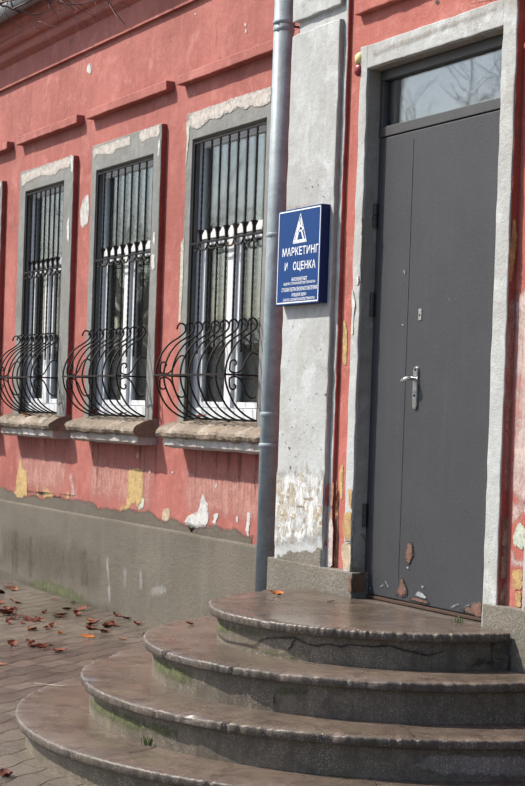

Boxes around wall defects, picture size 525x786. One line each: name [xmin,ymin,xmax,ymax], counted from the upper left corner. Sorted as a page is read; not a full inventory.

peeling [21,155,74,186]
peeling [93,125,160,158]
peeling [185,87,271,166]
peeling [342,218,364,365]
flaking render [0,459,252,544]
peeling [274,465,365,592]
spalling [499,517,525,607]
crack [216,629,445,656]